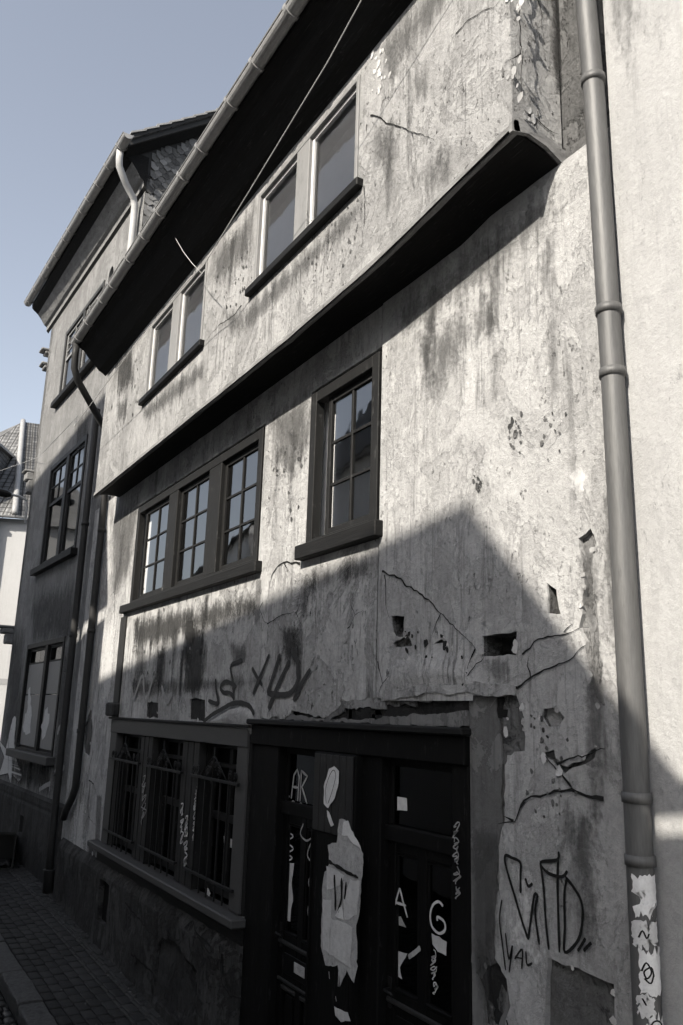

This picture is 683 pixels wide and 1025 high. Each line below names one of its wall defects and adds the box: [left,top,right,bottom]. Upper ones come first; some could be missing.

crack [456,1,557,134]
damp [552,0,562,90]
crack [370,114,434,146]
damp [133,592,255,702]
flaking render [392,631,463,661]
crack [382,570,483,686]
crack [516,624,589,689]
damp [203,700,255,722]
flaking render [502,695,598,818]
crack [498,748,604,824]